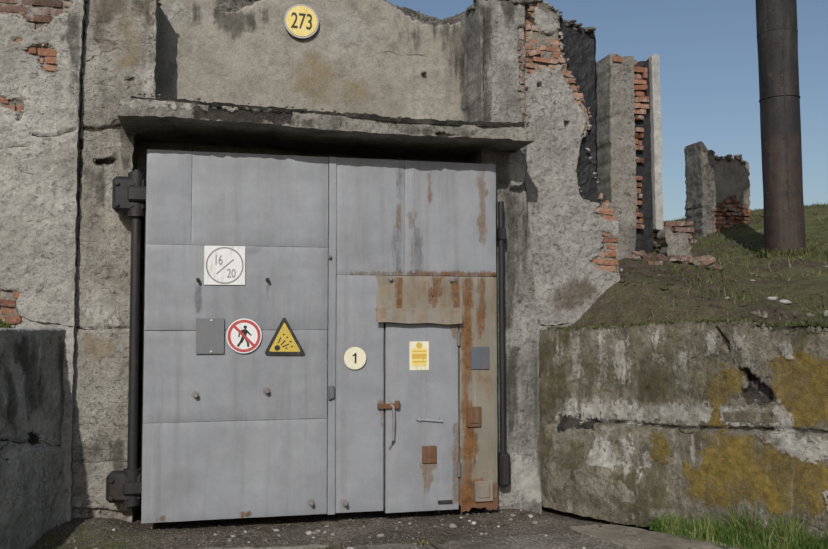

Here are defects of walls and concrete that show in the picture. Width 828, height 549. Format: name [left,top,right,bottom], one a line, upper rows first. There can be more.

flaking render [0,0,72,32]
flaking render [13,38,61,78]
flaking render [507,0,622,222]
flaking render [634,60,649,164]
flaking render [653,221,697,245]
flaking render [713,196,751,231]
flaking render [0,287,23,324]
damp [15,335,64,420]
corrosion [396,271,492,505]
spalling [733,361,782,406]
crack [584,407,828,434]
crack [0,430,61,461]